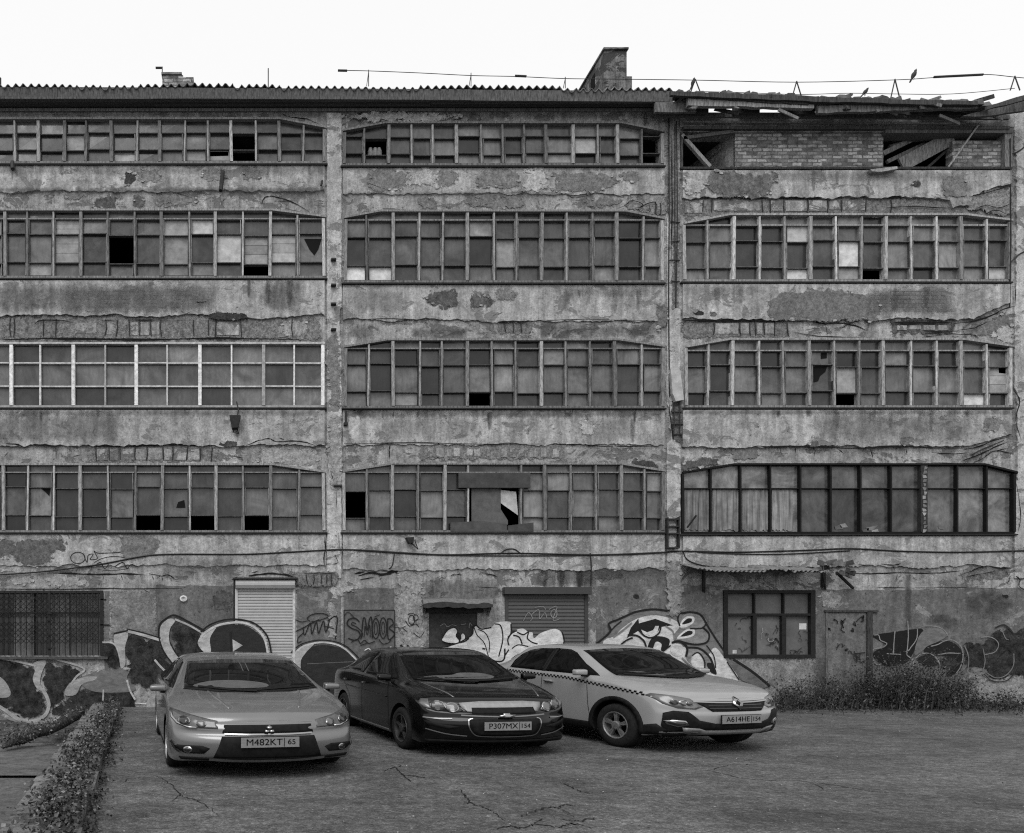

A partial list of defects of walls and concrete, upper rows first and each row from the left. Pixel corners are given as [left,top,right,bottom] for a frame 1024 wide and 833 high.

peeling [64,169,118,208]
peeling [124,168,198,208]
peeling [405,167,459,189]
peeling [475,168,549,192]
spalling [619,118,968,331]
peeling [422,287,518,310]
crack [792,320,870,337]
crack [762,390,1024,463]
peeling [0,537,87,588]
peeling [592,568,623,580]
spalling [958,565,1010,582]
crack [456,783,594,830]